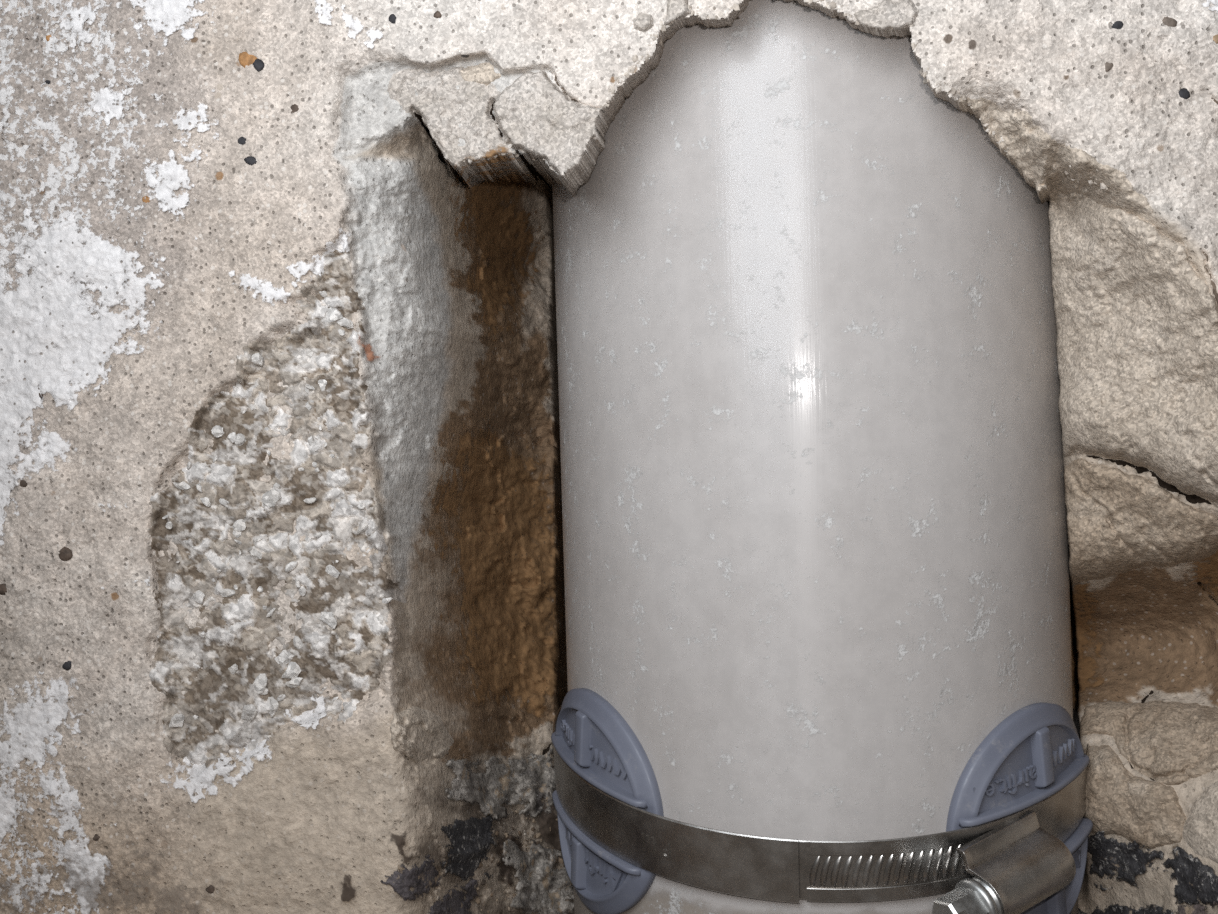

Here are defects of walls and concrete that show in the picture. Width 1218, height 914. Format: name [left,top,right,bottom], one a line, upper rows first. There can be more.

peeling [633,0,691,34]
spalling [854,0,919,38]
flaking render [387,62,613,196]
damp [0,0,219,546]
crack [1202,251,1218,306]
spalling [148,239,406,770]
crack [1087,455,1212,505]
damp [0,671,117,914]
damp [538,788,561,856]
damp [331,875,355,901]
damp [380,814,522,914]
damp [1078,831,1218,914]